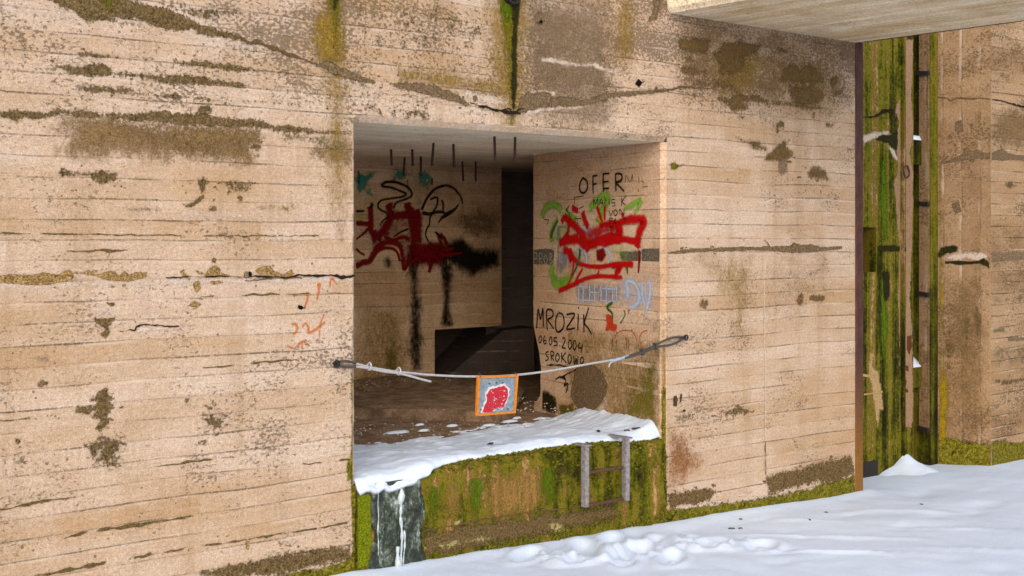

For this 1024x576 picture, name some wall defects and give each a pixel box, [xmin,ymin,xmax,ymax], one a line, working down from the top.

damp [480,0,633,128]
damp [315,0,345,179]
crack [470,102,523,115]
damp [56,115,263,166]
spalling [863,131,898,159]
spalling [938,245,1024,268]
spalling [0,270,153,288]
spalling [180,258,229,308]
crack [165,274,355,285]
spalling [244,265,294,277]
crack [119,324,179,332]
rust [670,440,696,481]